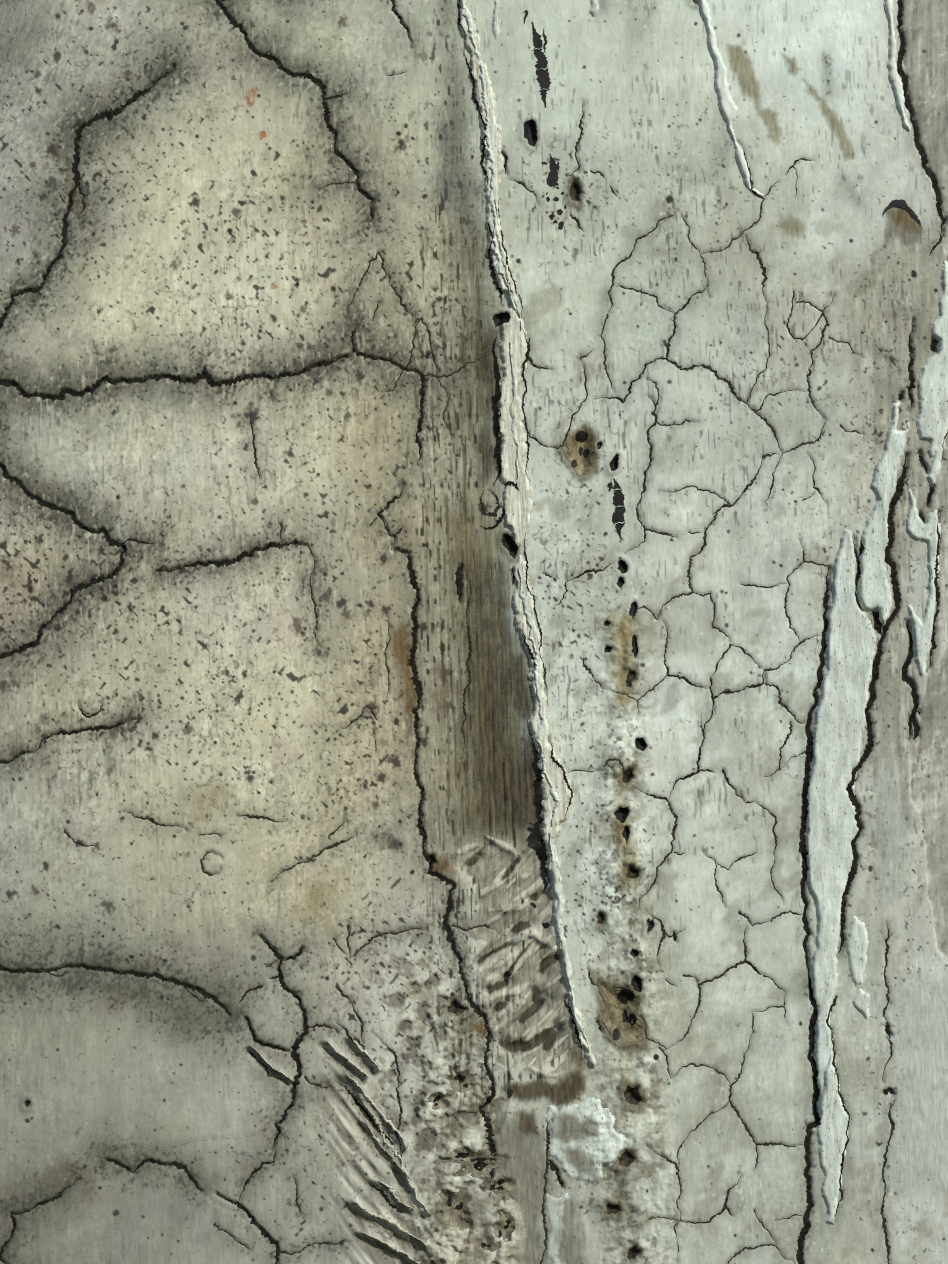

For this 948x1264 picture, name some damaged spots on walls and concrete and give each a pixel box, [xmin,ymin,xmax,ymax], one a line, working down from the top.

crack [501,151,538,203]
crack [568,105,617,196]
crack [897,0,945,254]
crack [0,0,500,1187]
peeling [321,0,629,1264]
leakage [451,431,538,838]
crack [520,145,948,1264]
peeling [805,261,948,1225]
crack [0,936,407,1264]